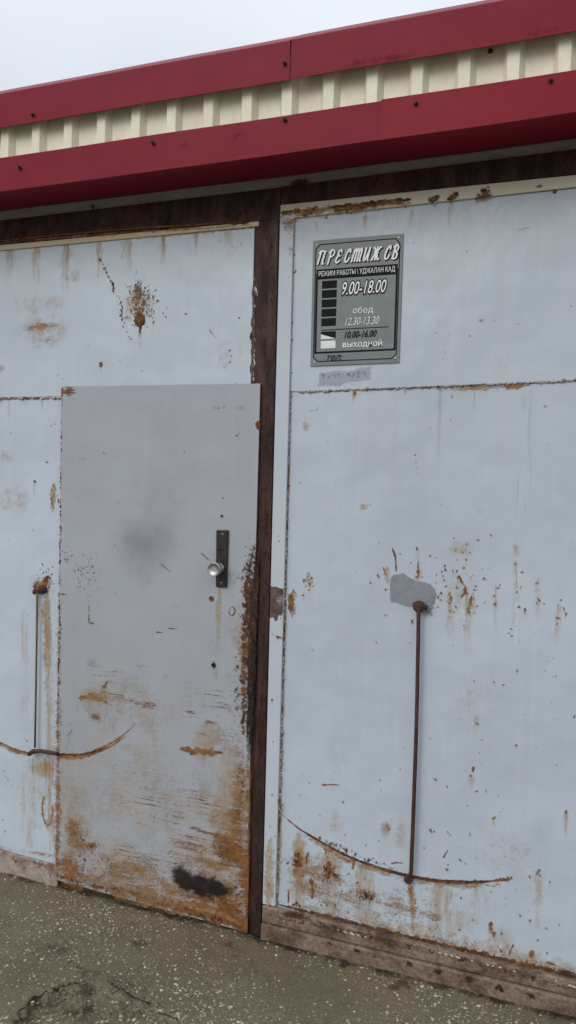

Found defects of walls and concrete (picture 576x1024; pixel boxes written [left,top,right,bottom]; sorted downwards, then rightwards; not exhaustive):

rust [119,271,167,340]
rust [34,414,576,979]